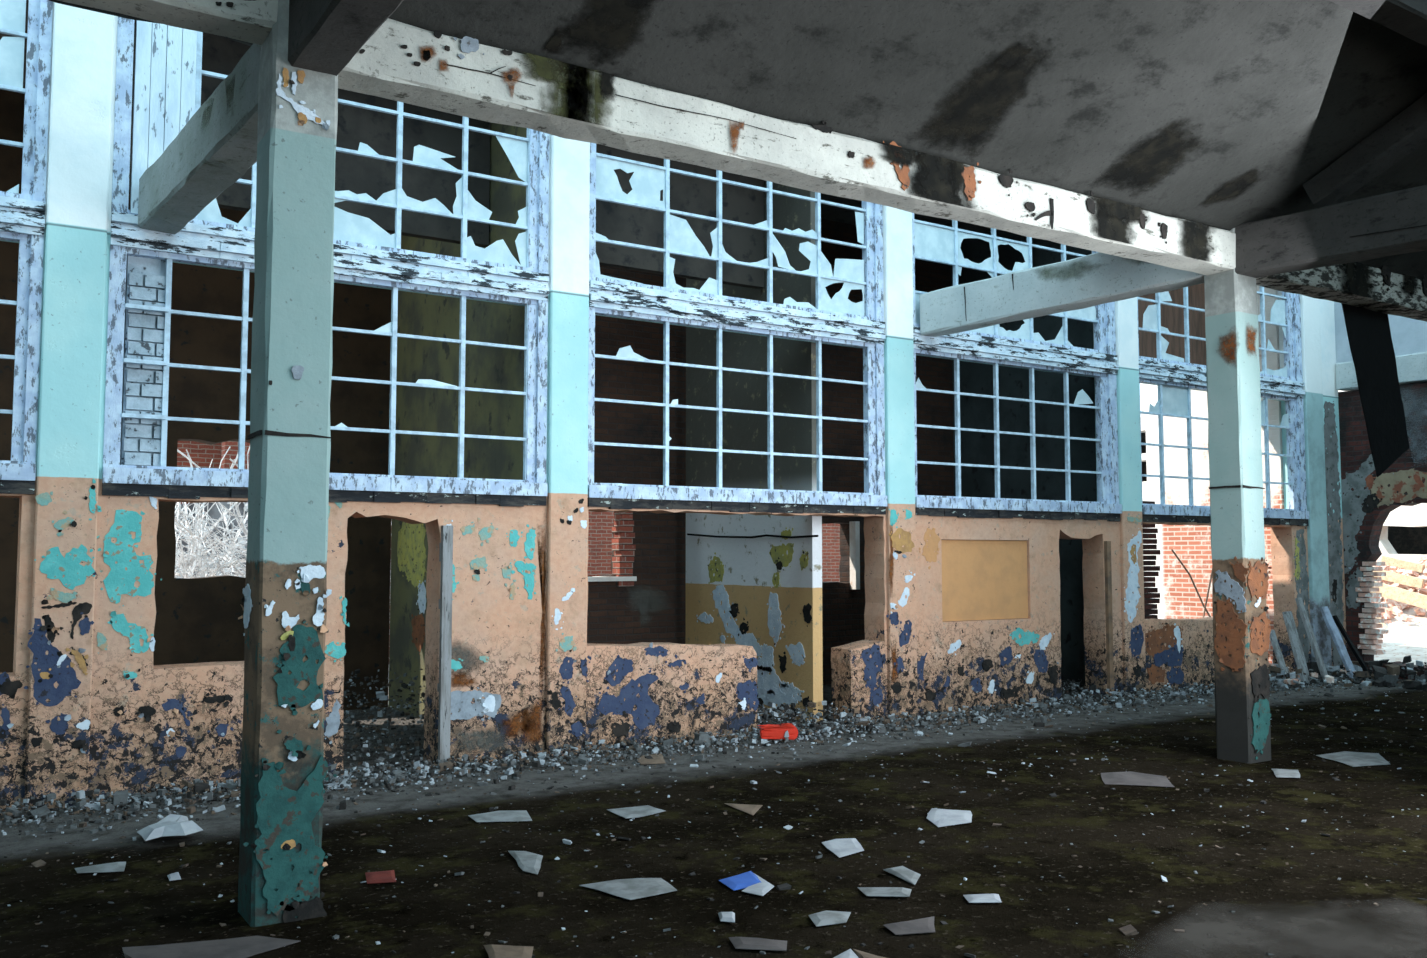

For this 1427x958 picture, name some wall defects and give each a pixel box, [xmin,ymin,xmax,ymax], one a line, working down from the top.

corrosion [730,122,744,152]
spalling [1381,265,1391,291]
crack [247,430,331,439]
peeling [0,479,162,753]
peeling [114,690,234,758]
peeling [238,565,349,923]
peeling [547,588,722,740]
flaking render [696,527,812,717]
peeling [860,507,1060,707]
peeling [1124,513,1184,688]
peeling [1211,556,1273,760]
flaking render [1324,401,1427,672]